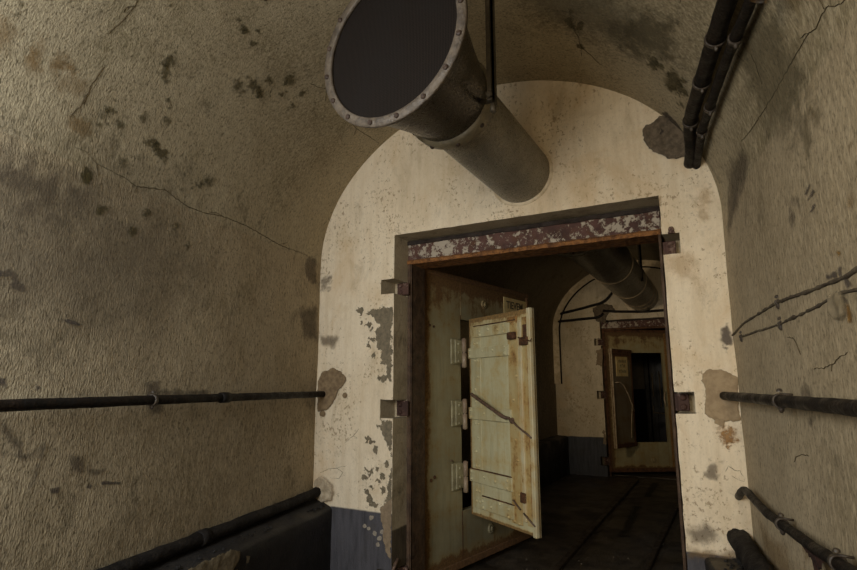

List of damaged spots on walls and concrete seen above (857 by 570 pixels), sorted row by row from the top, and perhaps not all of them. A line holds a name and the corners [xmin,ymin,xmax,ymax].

leakage [647,56,688,107]
crack [741,0,845,141]
crack [80,149,310,257]
peeling [356,306,393,383]
corrosion [720,426,739,449]
peeling [361,418,392,559]
peeling [188,549,250,570]